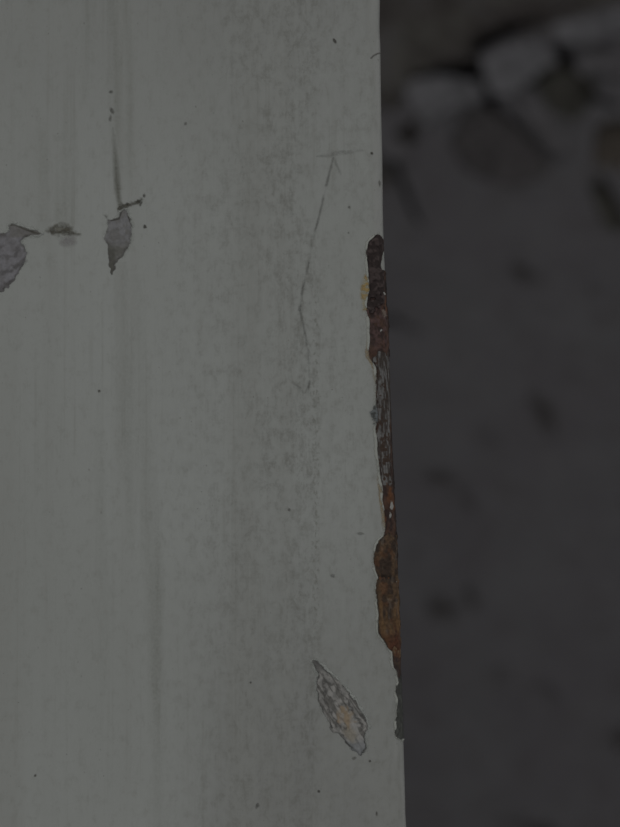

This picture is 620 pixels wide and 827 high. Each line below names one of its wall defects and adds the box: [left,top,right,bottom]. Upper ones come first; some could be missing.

peeling [0,222,44,292]
peeling [104,199,142,274]
rust [361,234,404,742]
peeling [311,660,371,755]